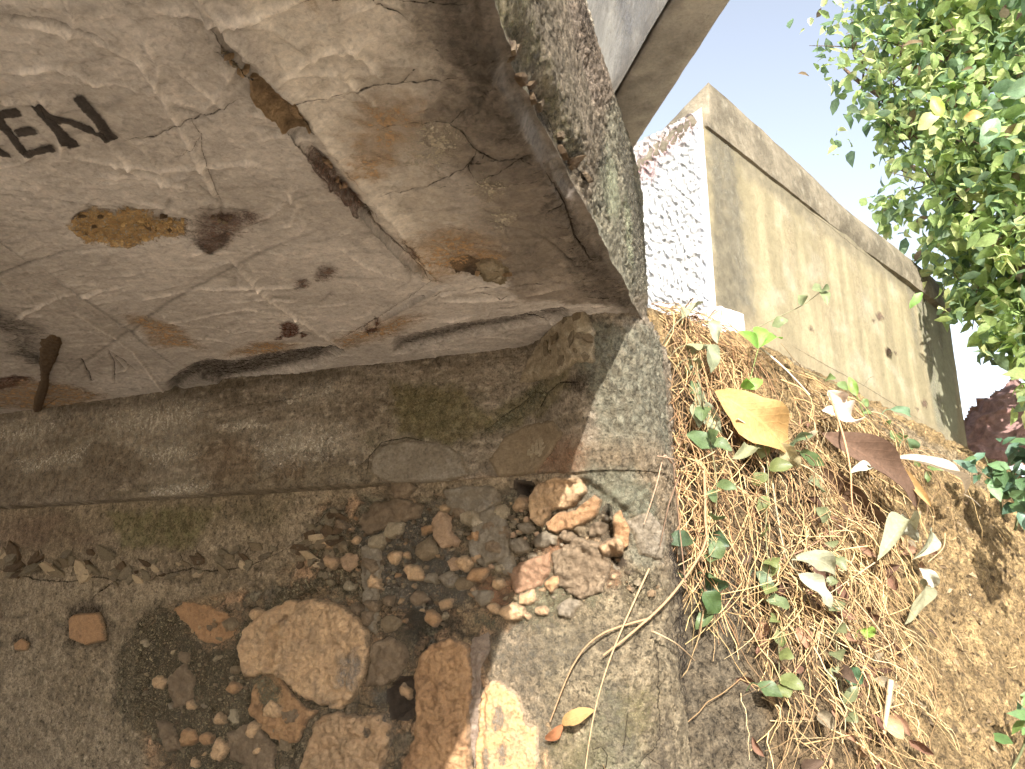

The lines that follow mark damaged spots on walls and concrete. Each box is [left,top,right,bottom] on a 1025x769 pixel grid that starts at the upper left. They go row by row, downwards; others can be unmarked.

crack [126,32,253,195]
crack [296,69,453,105]
crack [288,109,589,339]